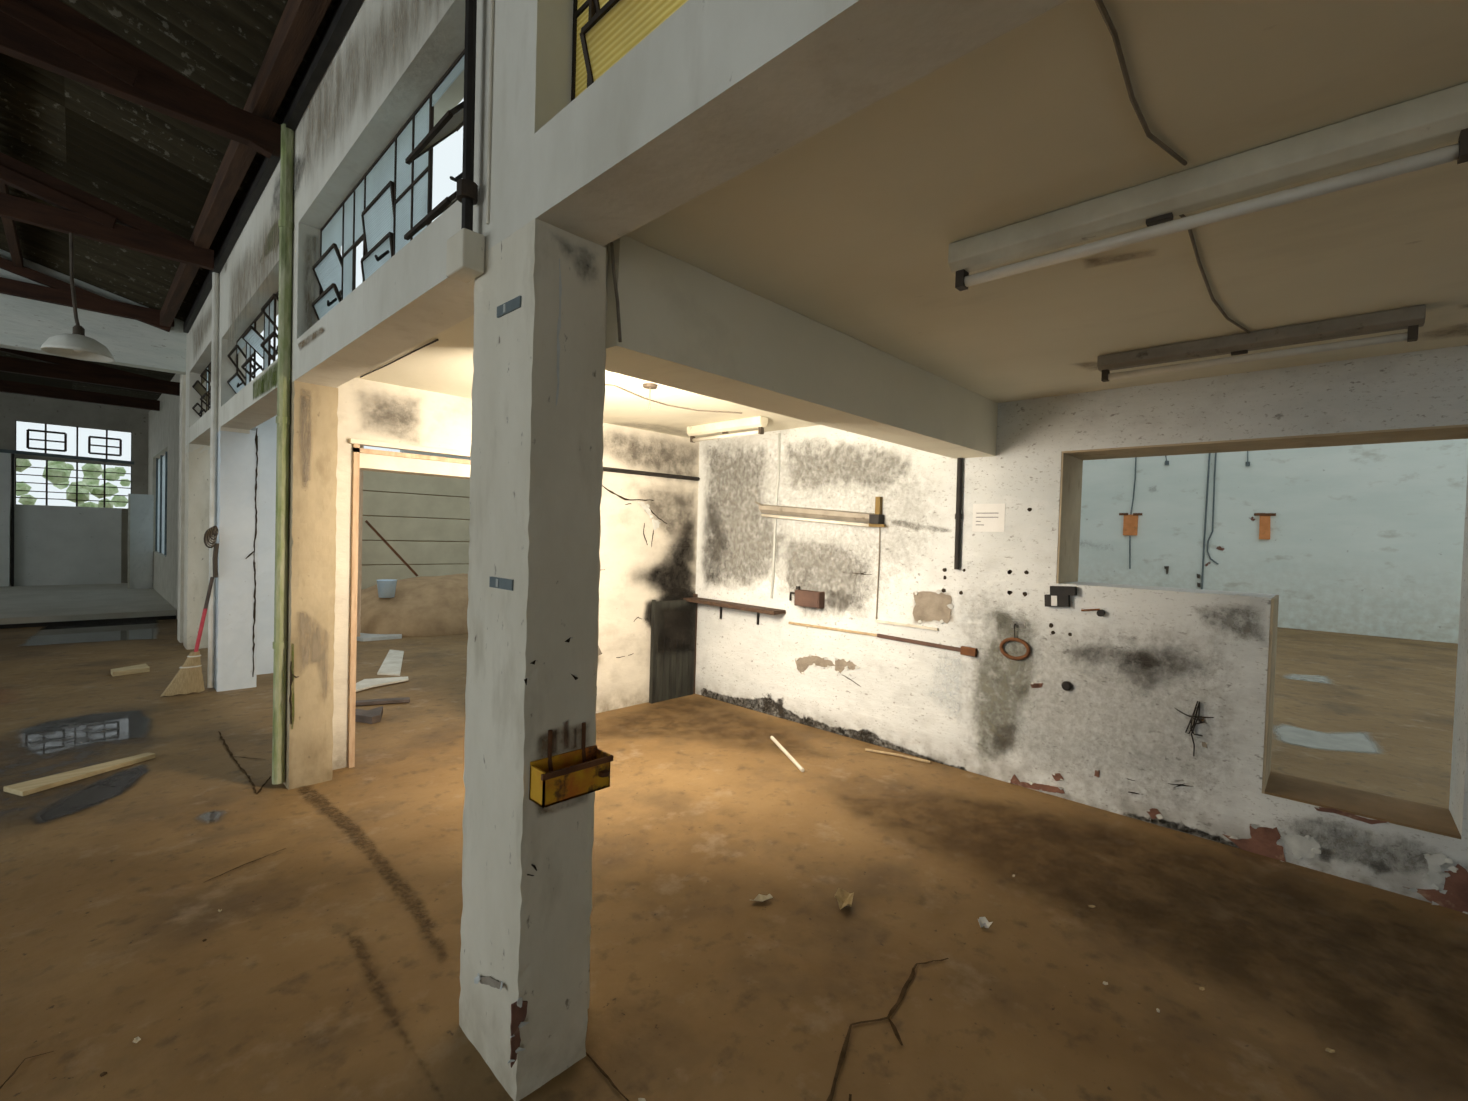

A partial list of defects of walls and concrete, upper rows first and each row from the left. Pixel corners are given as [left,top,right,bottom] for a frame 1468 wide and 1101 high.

leakage [978,615,1030,755]
spalling [1223,824,1321,862]
spalling [1405,853,1468,914]
spalling [474,973,529,1068]
crack [586,1052,629,1101]
crack [826,958,949,1101]